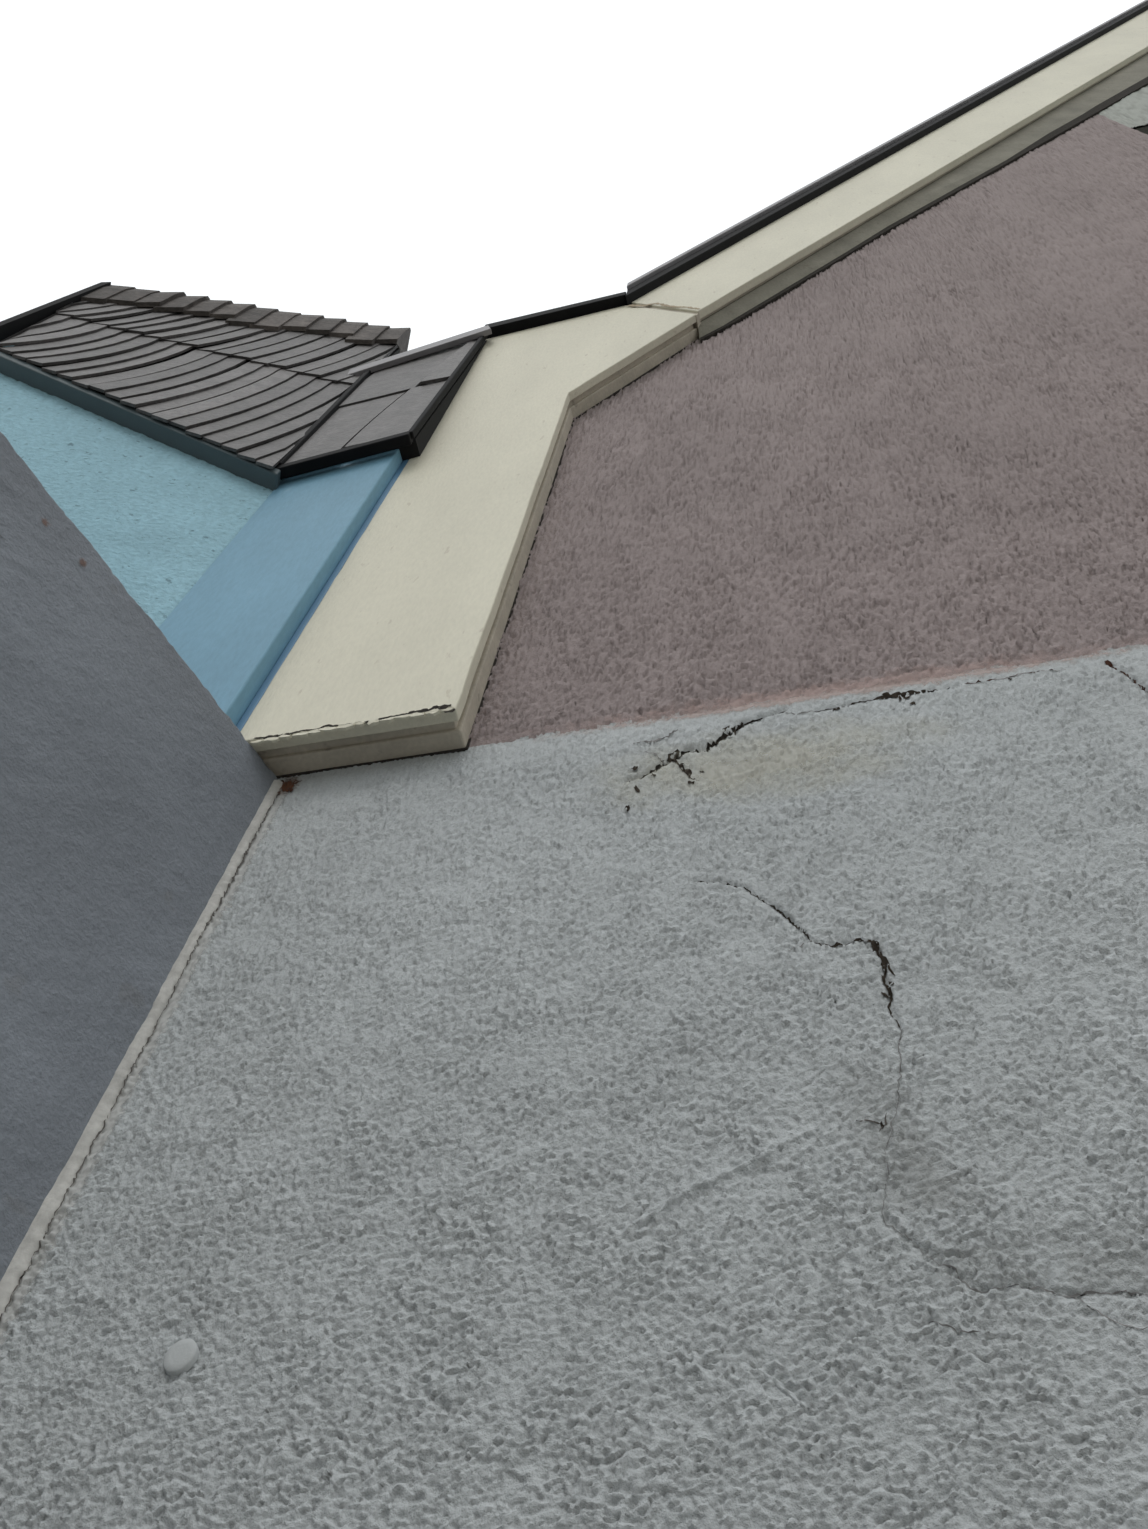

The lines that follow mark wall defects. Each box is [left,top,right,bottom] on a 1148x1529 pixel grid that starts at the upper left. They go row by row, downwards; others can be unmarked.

crack [625,669,1066,812]
crack [1104,660,1146,691]
crack [698,881,1148,1330]
crack [929,1321,990,1333]